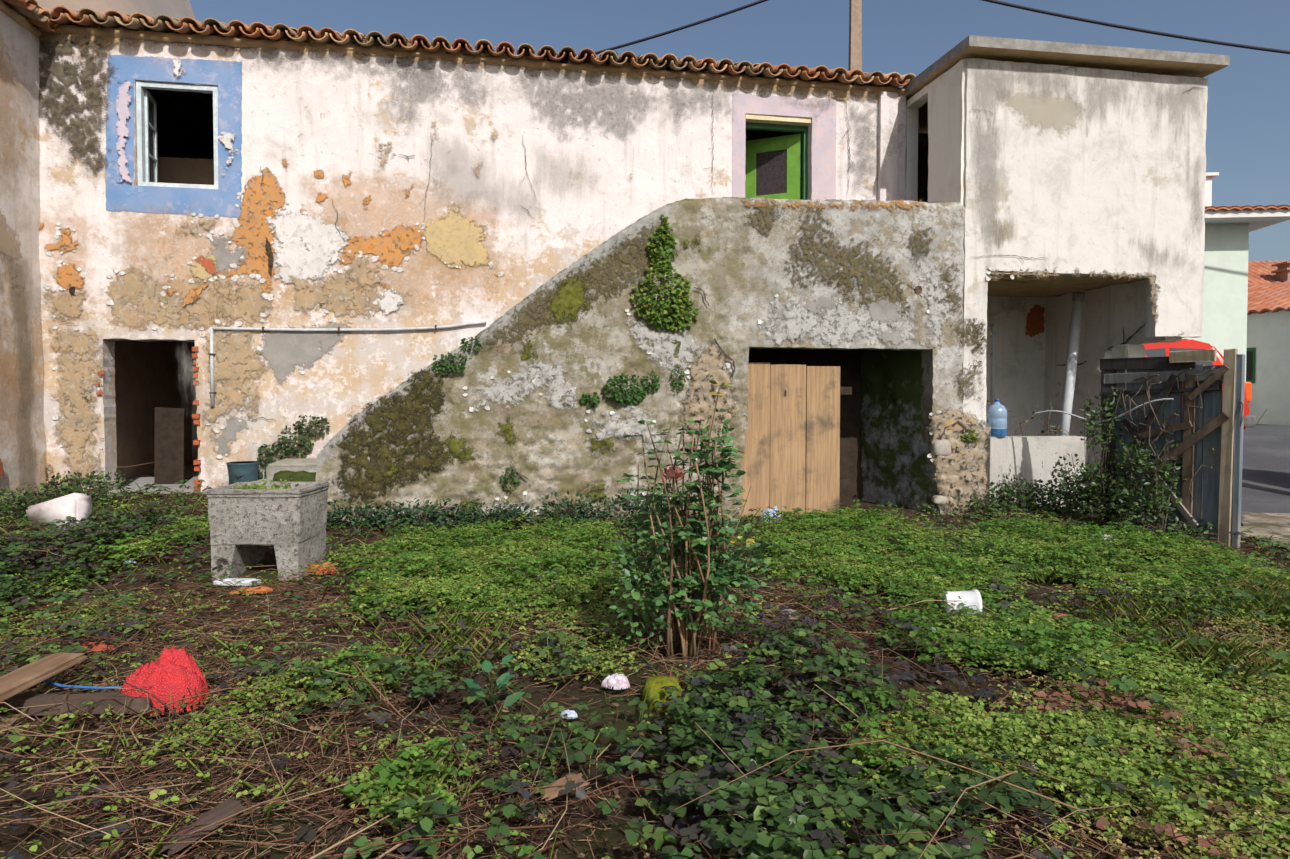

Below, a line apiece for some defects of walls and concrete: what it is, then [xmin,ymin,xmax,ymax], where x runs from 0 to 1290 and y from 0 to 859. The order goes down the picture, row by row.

water stain [38,24,881,185]
peeling [377,141,396,167]
flaking render [106,157,504,460]
flaking render [1025,304,1045,338]
spalling [986,266,1161,323]
flaking render [39,221,107,486]
spalling [1092,344,1145,376]